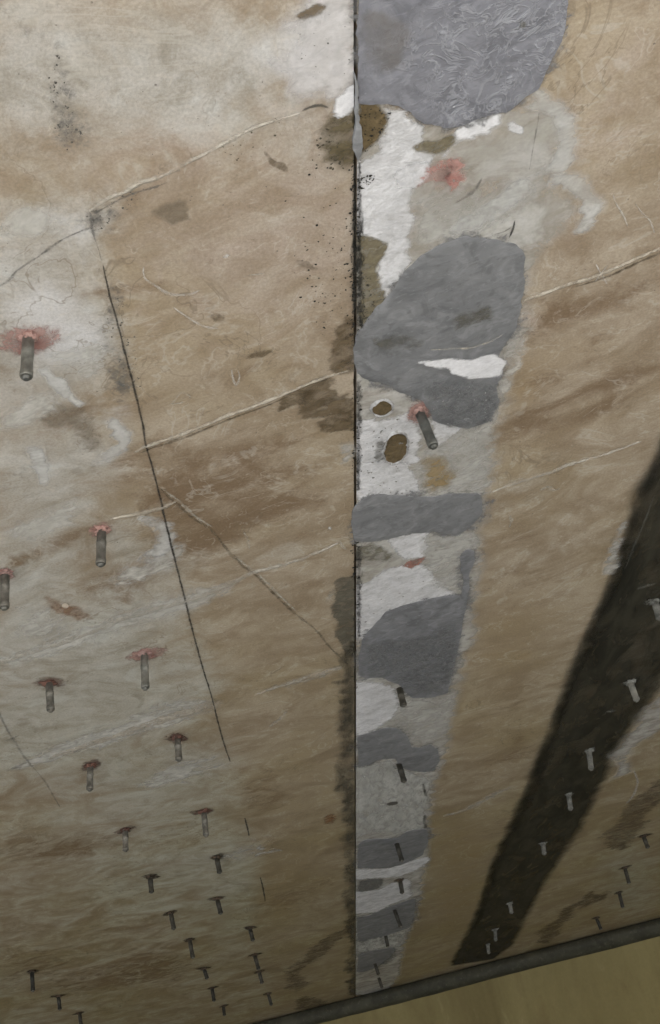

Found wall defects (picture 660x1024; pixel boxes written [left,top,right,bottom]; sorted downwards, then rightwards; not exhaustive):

crack [42,209,102,254]
crack [103,266,348,761]
damp [286,542,362,1010]
damp [279,109,391,491]
damp [452,458,660,965]